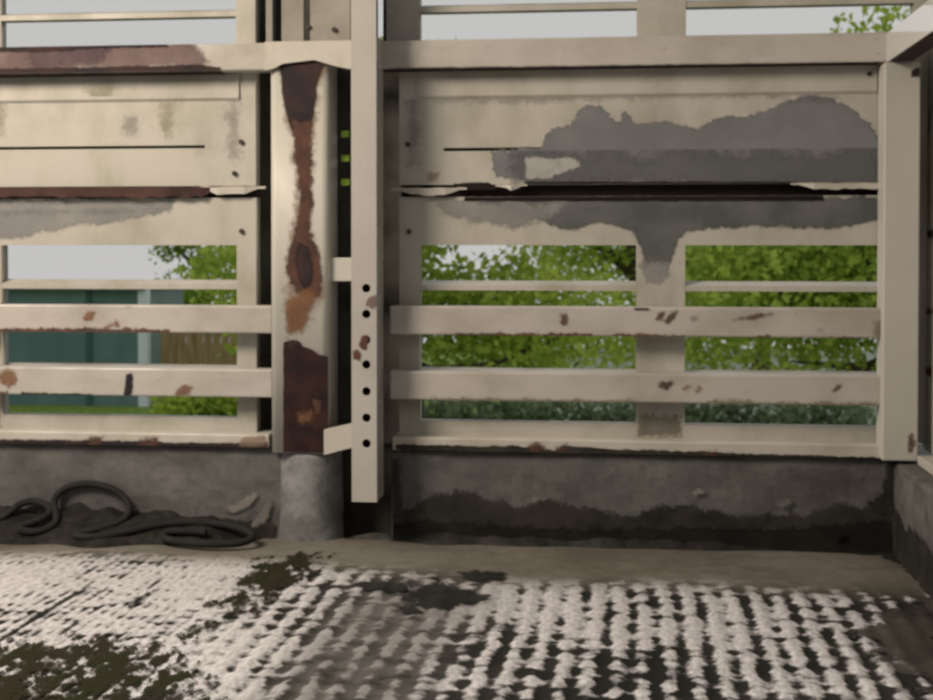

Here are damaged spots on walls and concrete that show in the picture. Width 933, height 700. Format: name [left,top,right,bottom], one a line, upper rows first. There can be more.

corrosion [0,44,225,78]
peeling [454,94,878,202]
corrosion [279,60,328,453]
corrosion [0,312,169,333]
corrosion [455,314,593,336]
corrosion [634,308,676,323]
corrosion [353,336,369,360]
corrosion [0,370,91,395]
corrosion [124,373,133,396]
corrosion [175,385,192,396]
leakage [393,459,933,693]